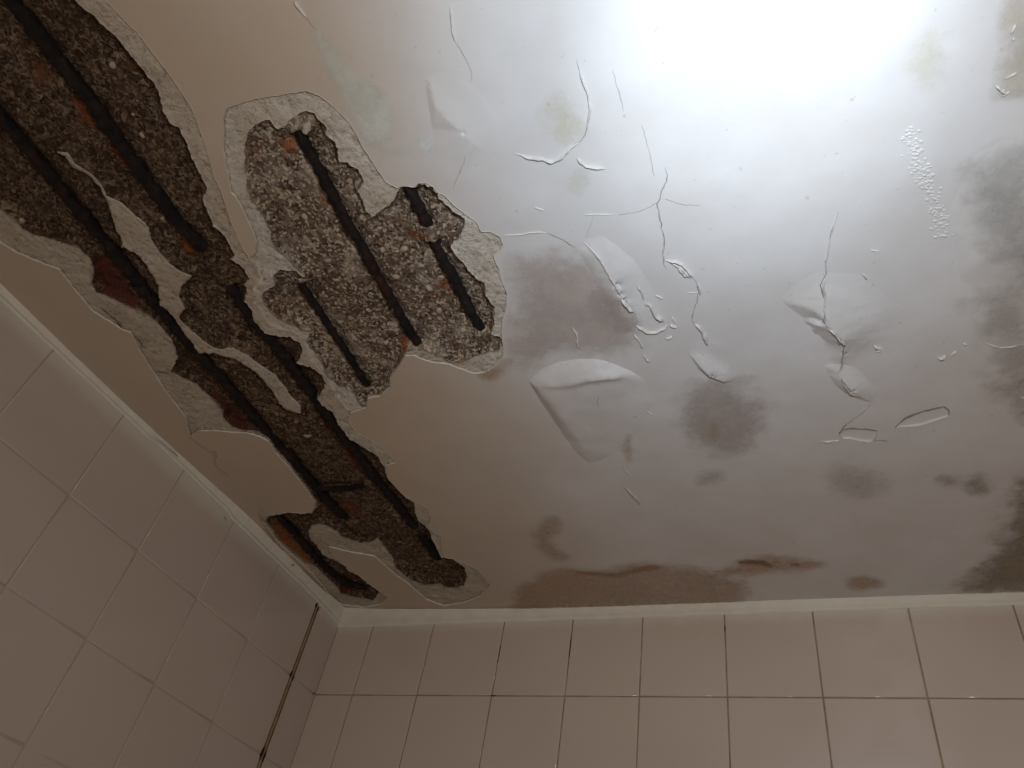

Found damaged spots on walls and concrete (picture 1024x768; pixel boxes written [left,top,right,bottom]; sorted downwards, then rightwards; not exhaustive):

crack [515,63,591,164]
spalling [0,0,507,608]
crack [503,127,709,362]
crack [820,213,949,443]
corrosion [275,521,310,563]
leakage [968,502,1024,593]